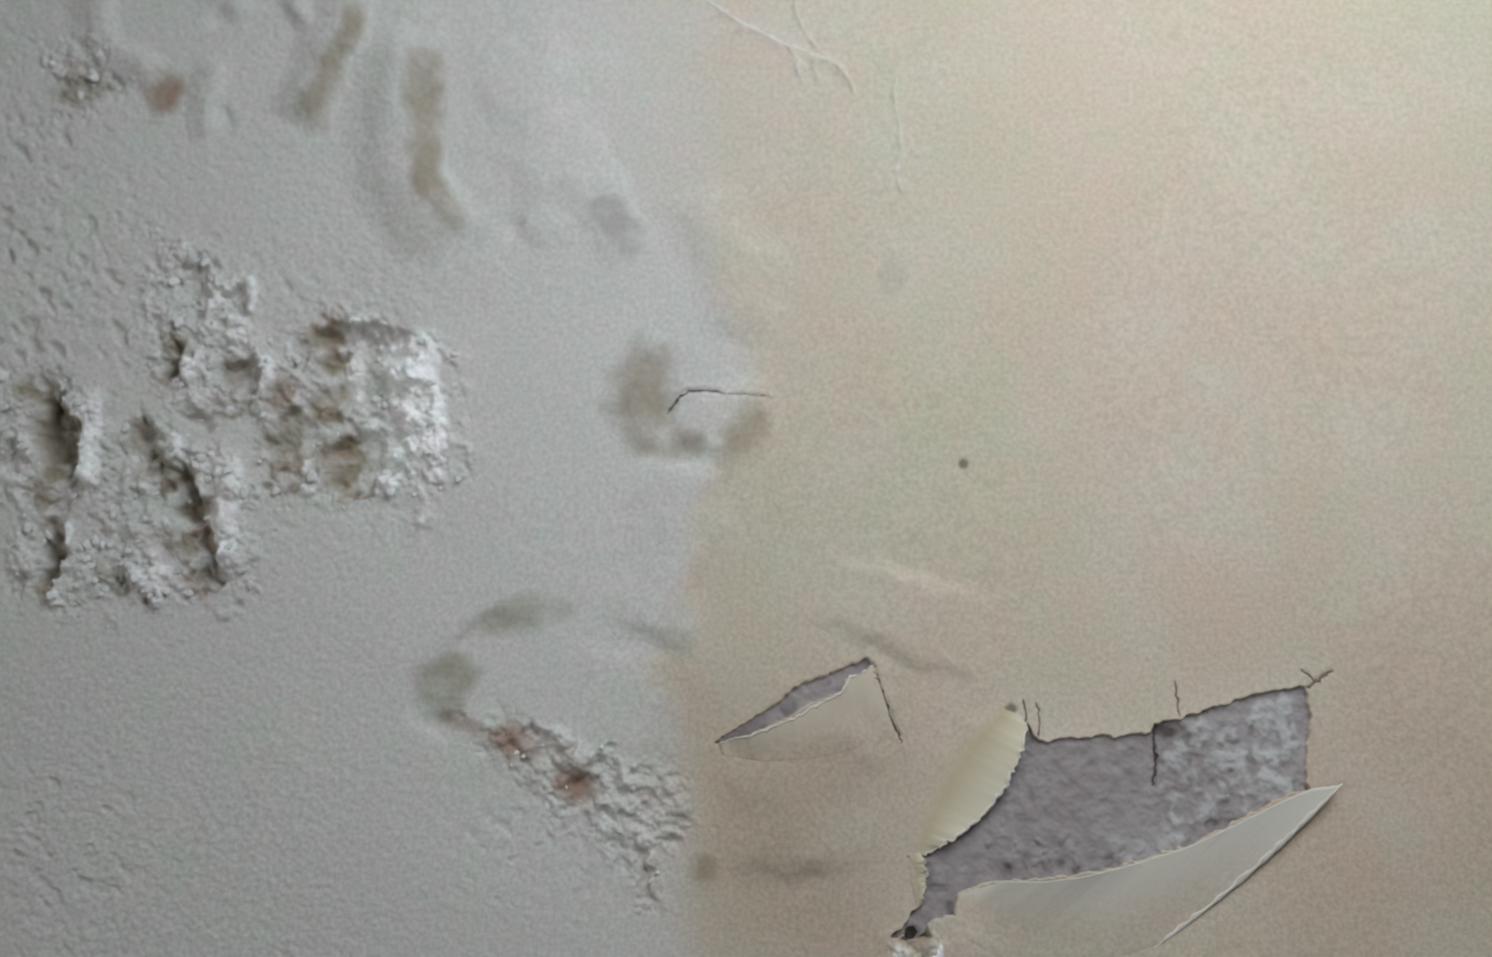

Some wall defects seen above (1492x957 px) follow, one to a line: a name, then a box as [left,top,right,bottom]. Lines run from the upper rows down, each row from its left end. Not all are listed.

crack [706,0,854,96]
spalling [0,211,480,632]
crack [666,389,772,415]
spalling [441,695,722,916]
peeling [878,687,1343,957]